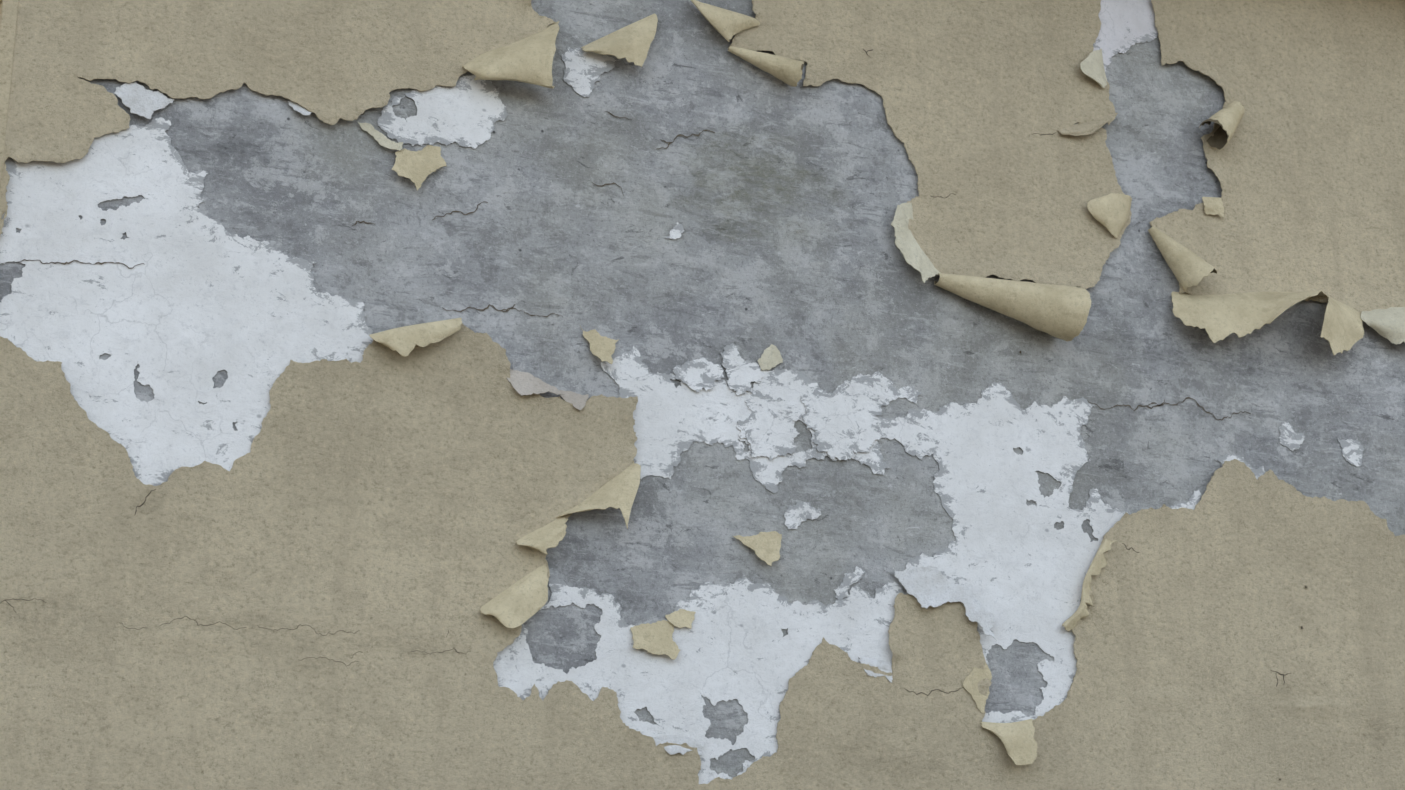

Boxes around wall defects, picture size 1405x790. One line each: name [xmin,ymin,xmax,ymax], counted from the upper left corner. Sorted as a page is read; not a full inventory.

peeling [79,78,175,119]
peeling [0,117,373,486]
peeling [114,0,1405,536]
peeling [480,345,996,784]
peeling [876,382,1130,765]